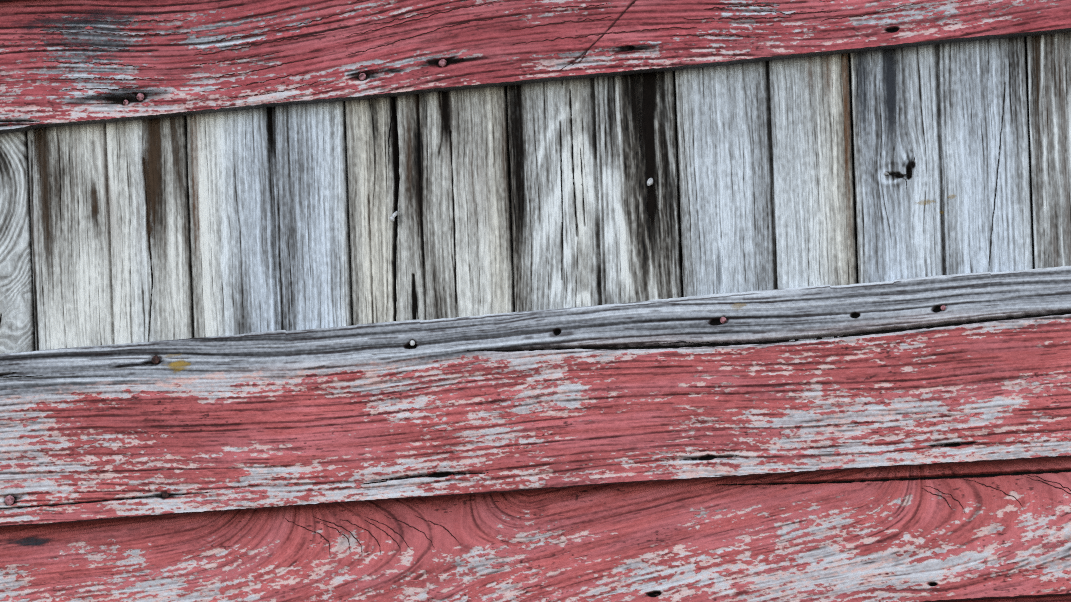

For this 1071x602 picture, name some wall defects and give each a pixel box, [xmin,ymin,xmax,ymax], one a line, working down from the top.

crack [144,165,153,340]
crack [388,112,416,315]
crack [40,0,923,304]
crack [989,95,1005,259]
peeling [0,385,166,502]
peeling [107,463,489,515]
crack [285,515,457,554]
peeling [364,377,607,450]
peeling [538,507,979,602]
peeling [659,396,1014,478]
crack [717,469,1071,513]
peeling [786,435,1071,471]